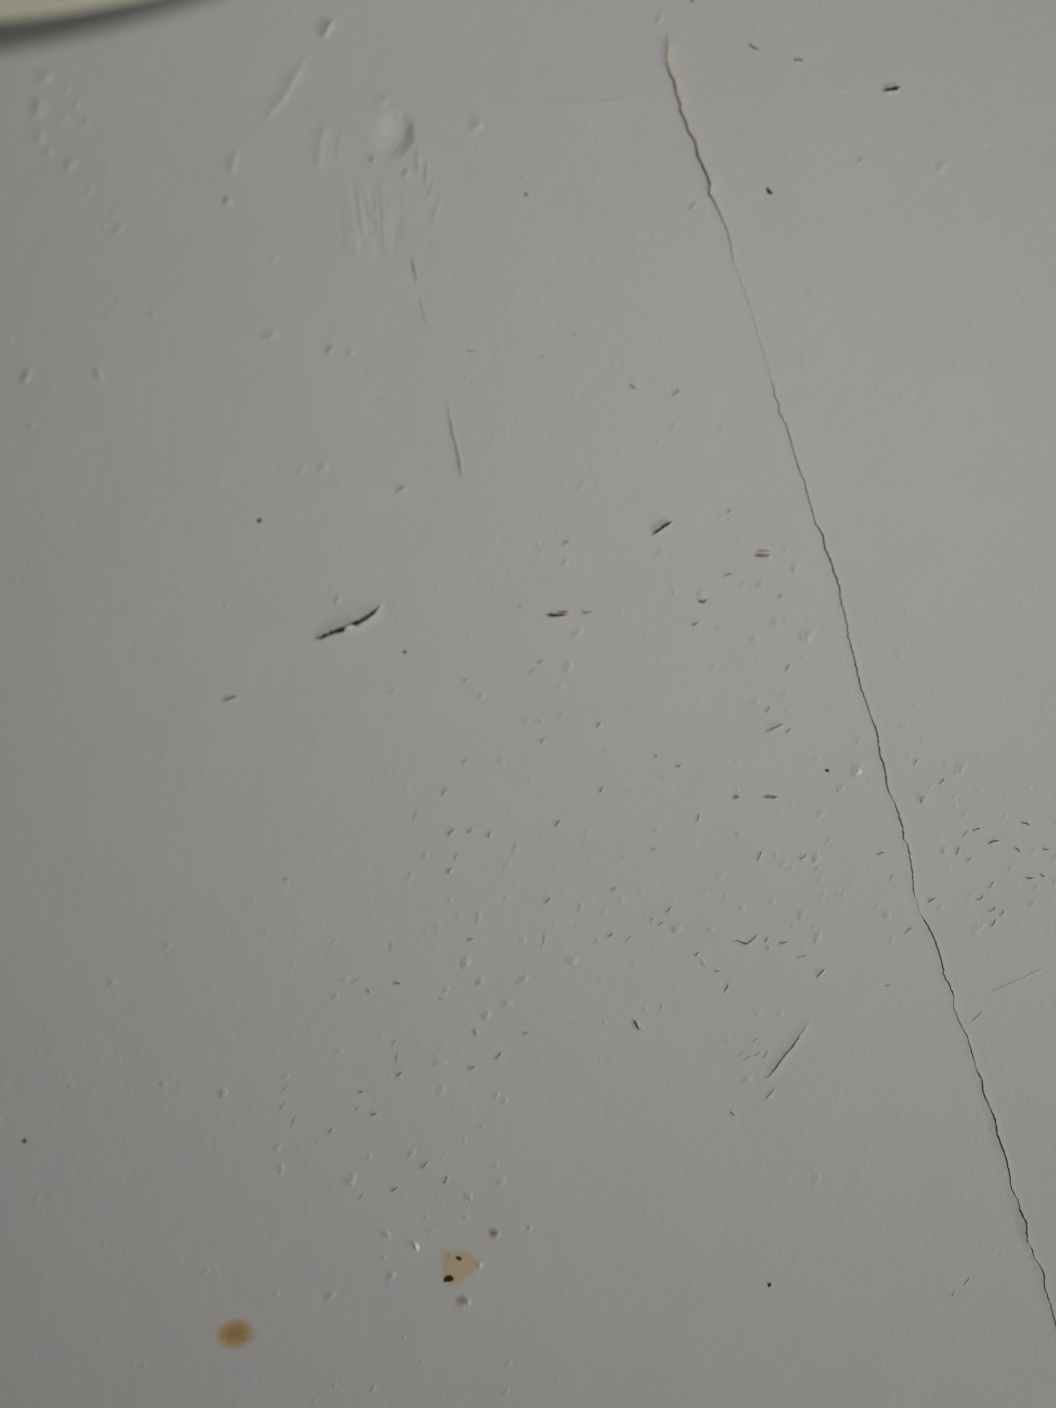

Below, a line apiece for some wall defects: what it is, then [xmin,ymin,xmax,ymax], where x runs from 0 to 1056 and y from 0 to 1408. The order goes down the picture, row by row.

rust [197,1305,271,1363]
crack [659,31,1056,1349]